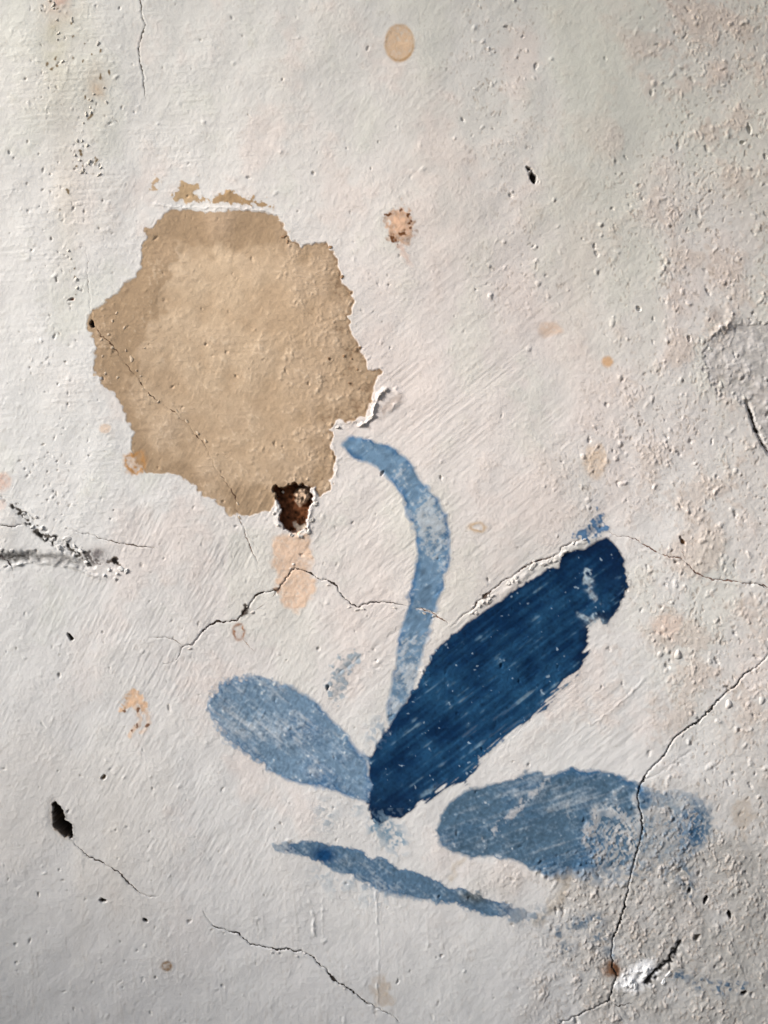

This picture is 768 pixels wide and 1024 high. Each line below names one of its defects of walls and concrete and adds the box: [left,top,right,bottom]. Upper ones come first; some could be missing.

crack [138,0,146,99]
water stain [383,22,416,64]
peeling [86,173,405,538]
crack [152,539,586,664]
crack [610,532,767,588]
spalling [47,795,74,843]
crack [73,841,151,897]
crack [563,659,765,1021]
crack [203,912,399,1022]